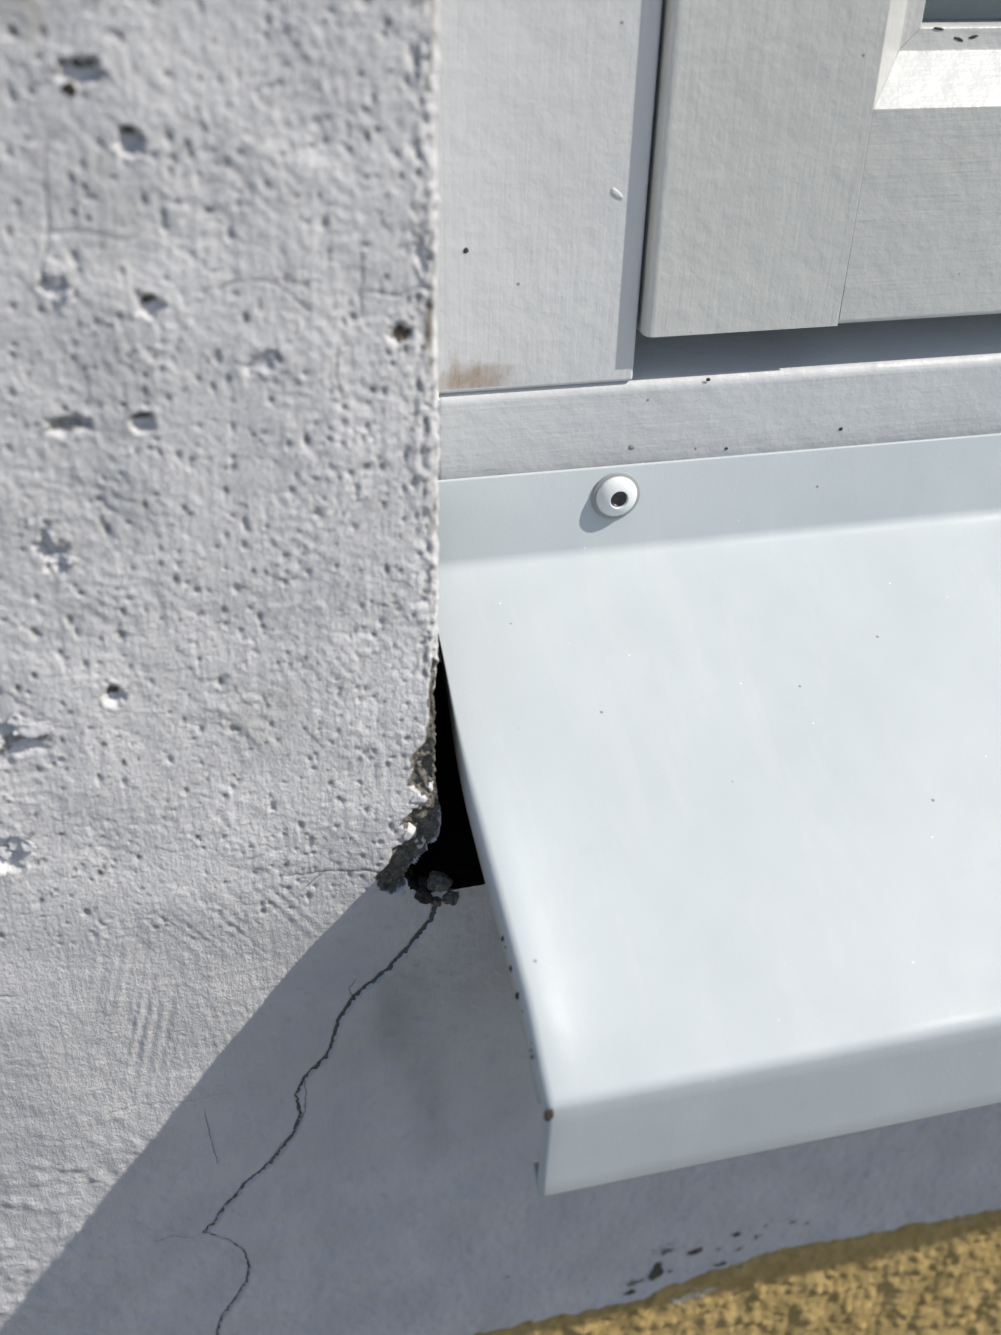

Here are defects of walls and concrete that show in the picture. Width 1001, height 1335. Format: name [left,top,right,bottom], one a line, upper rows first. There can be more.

spalling [373,658,441,894]
crack [159,906,437,1335]